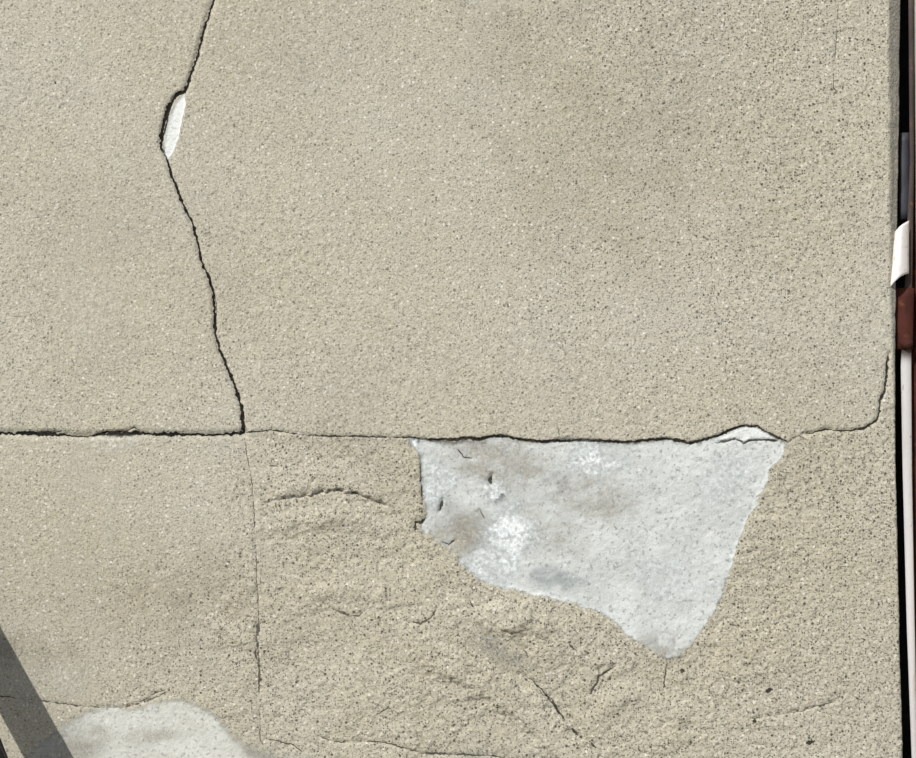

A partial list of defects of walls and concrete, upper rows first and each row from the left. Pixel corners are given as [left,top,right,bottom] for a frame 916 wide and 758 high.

crack [832,0,840,94]
spalling [164,94,186,160]
crack [0,0,410,752]
crack [790,356,889,441]
crack [414,467,426,531]
peeling [408,424,788,658]
peeling [30,700,268,758]
crack [366,740,504,758]